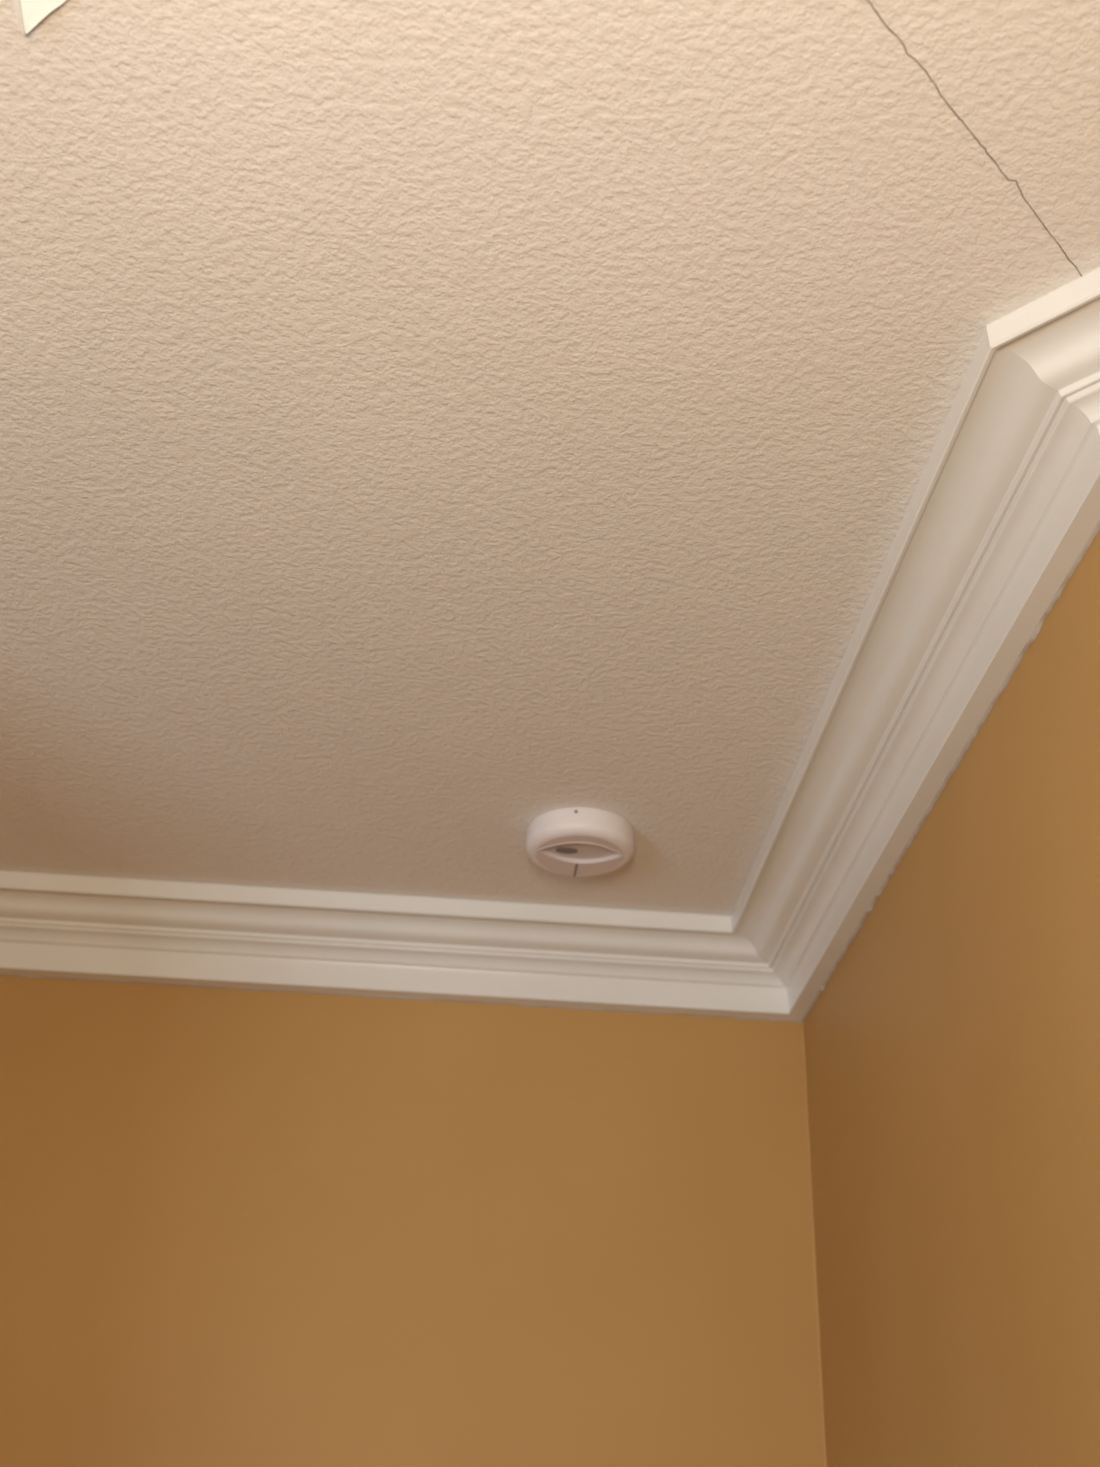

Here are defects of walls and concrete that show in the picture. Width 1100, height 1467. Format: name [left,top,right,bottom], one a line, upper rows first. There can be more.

crack [867,0,1082,276]